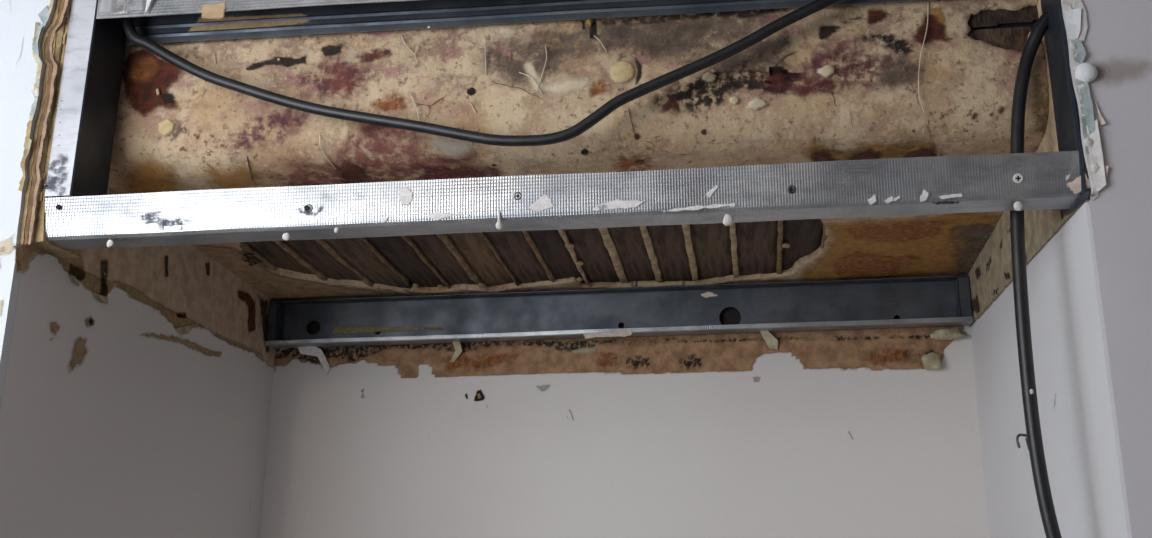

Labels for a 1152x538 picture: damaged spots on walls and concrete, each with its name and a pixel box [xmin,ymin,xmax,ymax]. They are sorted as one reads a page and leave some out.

peeling [34,6,49,45]
water stain [300,62,362,95]
mould [712,35,789,74]
mould [781,34,917,96]
water stain [127,162,182,194]
water stain [180,108,304,189]
water stain [279,124,501,187]
peeling [1080,82,1109,192]